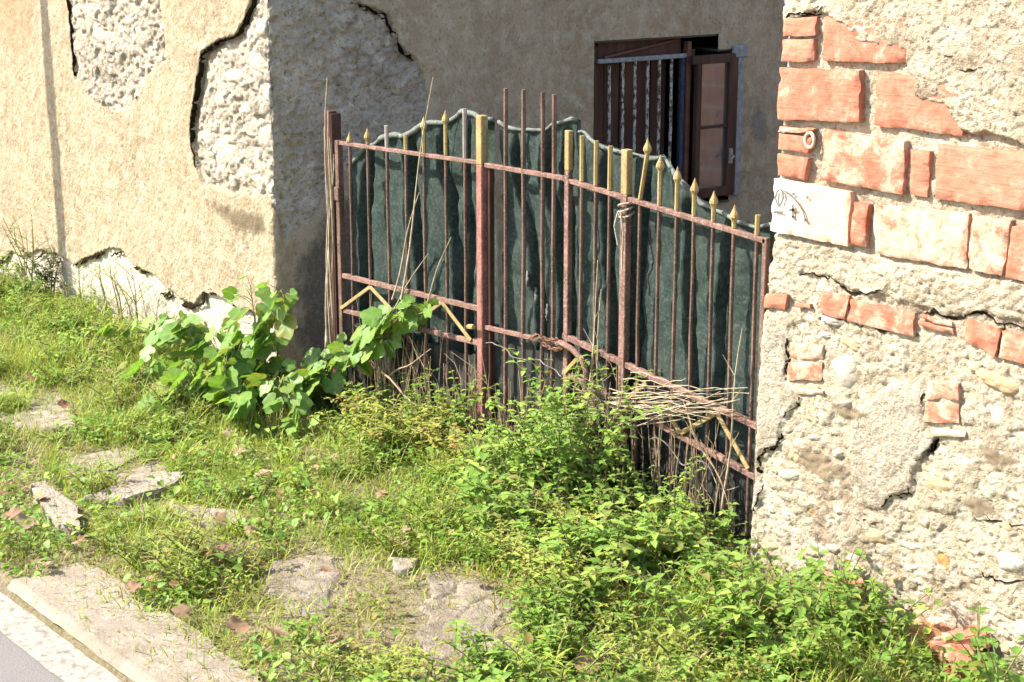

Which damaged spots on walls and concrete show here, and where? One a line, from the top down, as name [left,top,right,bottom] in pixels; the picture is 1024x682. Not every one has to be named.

spalling [69,0,167,114]
crack [351,2,413,62]
spalling [195,0,427,237]
spalling [770,16,1024,282]
peeling [0,248,258,351]
crack [801,272,888,333]
crack [752,338,800,511]
crack [854,439,939,524]